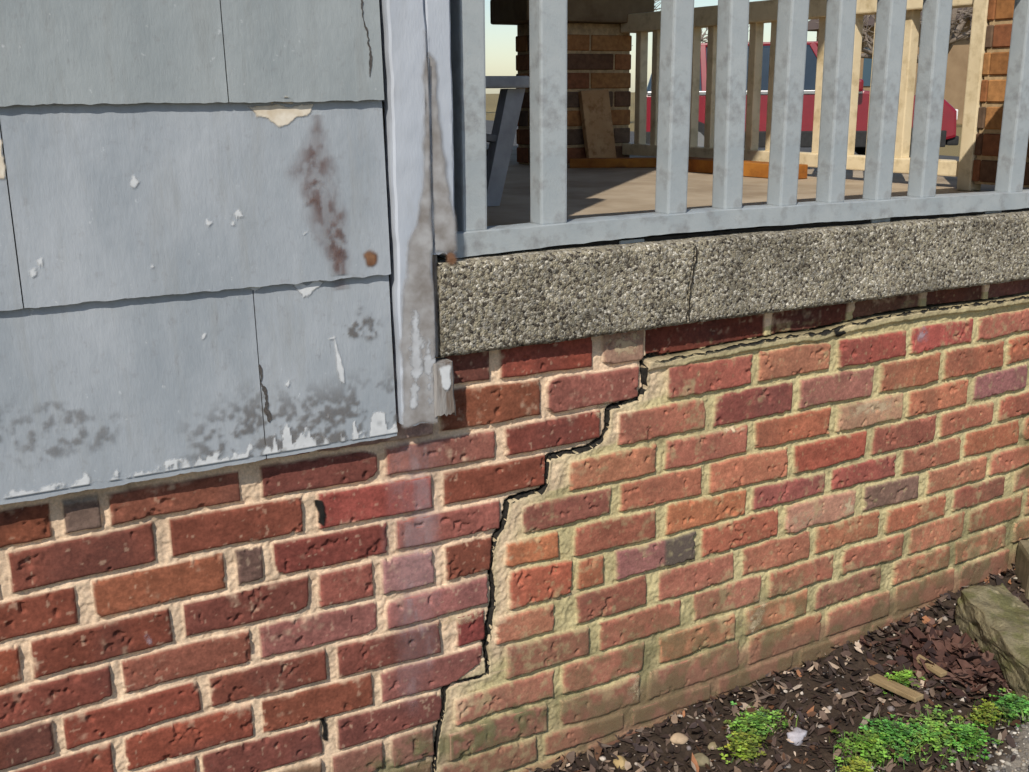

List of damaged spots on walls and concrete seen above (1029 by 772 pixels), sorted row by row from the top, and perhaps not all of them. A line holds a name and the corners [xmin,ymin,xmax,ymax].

crack [361,0,373,77]
peeling [110,53,456,481]
rust [330,245,344,275]
rust [364,251,377,266]
crack [688,247,698,320]
crack [258,364,272,423]
peeling [5,473,90,499]
crack [432,296,1029,772]